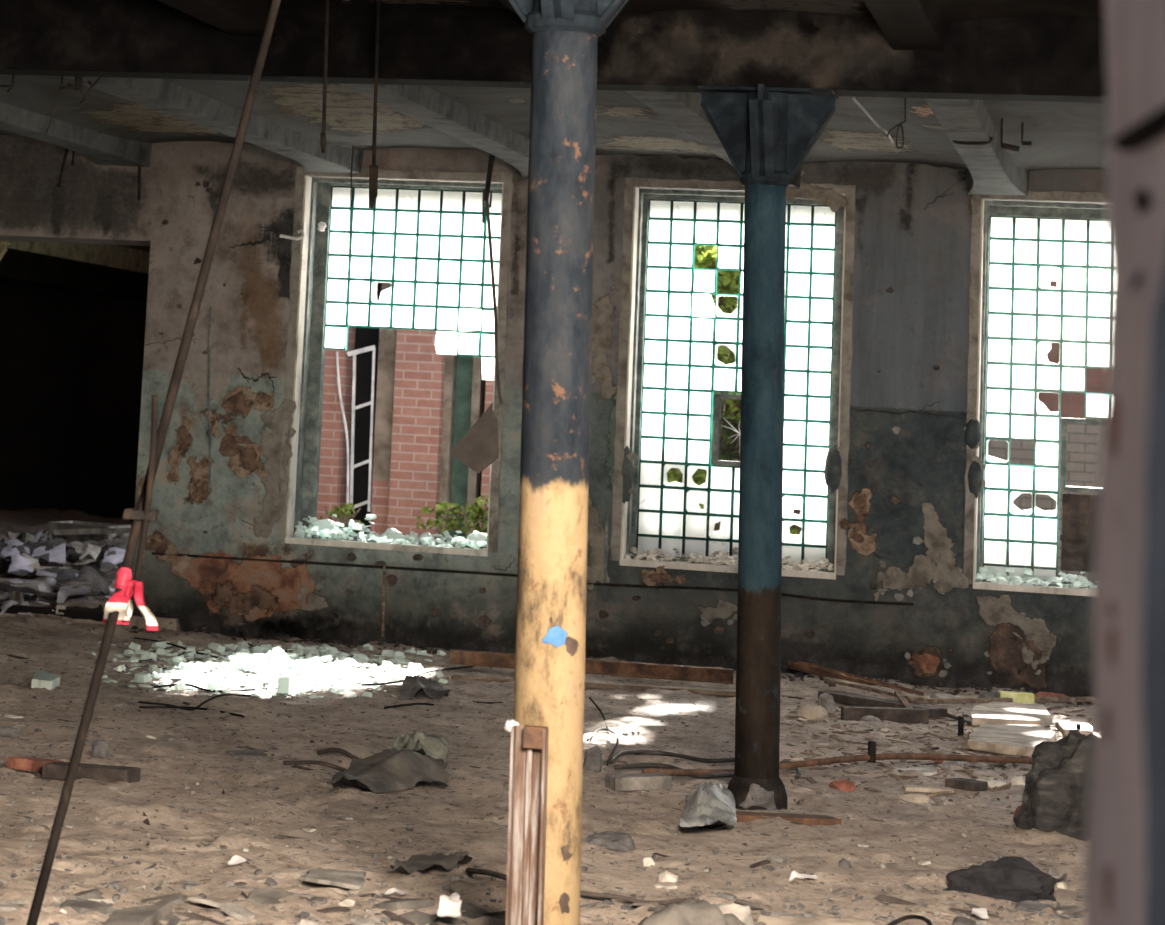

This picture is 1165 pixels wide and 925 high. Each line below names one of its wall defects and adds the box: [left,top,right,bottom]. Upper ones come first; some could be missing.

leakage [77,103,222,135]
leakage [257,83,432,137]
flaking render [166,386,297,538]
flaking render [145,531,328,622]
flaking render [696,599,737,636]
flaking render [840,488,1057,690]